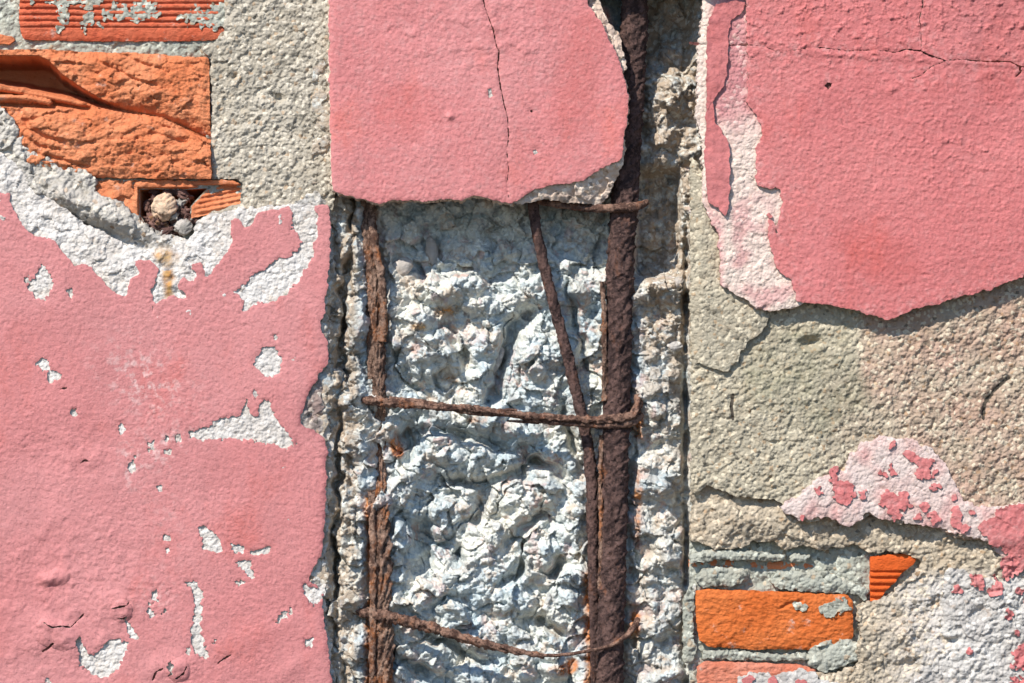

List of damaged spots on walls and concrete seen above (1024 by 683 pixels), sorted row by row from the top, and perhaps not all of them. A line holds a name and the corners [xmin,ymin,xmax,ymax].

peeling [0,106,318,318]
peeling [128,389,293,473]
rust [365,202,388,379]
crack [483,0,509,198]
spalling [376,144,627,683]
rust [600,281,608,402]
crack [689,40,757,48]
peeling [688,0,803,372]
crack [798,47,1023,79]
rust [365,491,378,683]
rust [584,435,604,641]
peeling [780,435,1024,683]